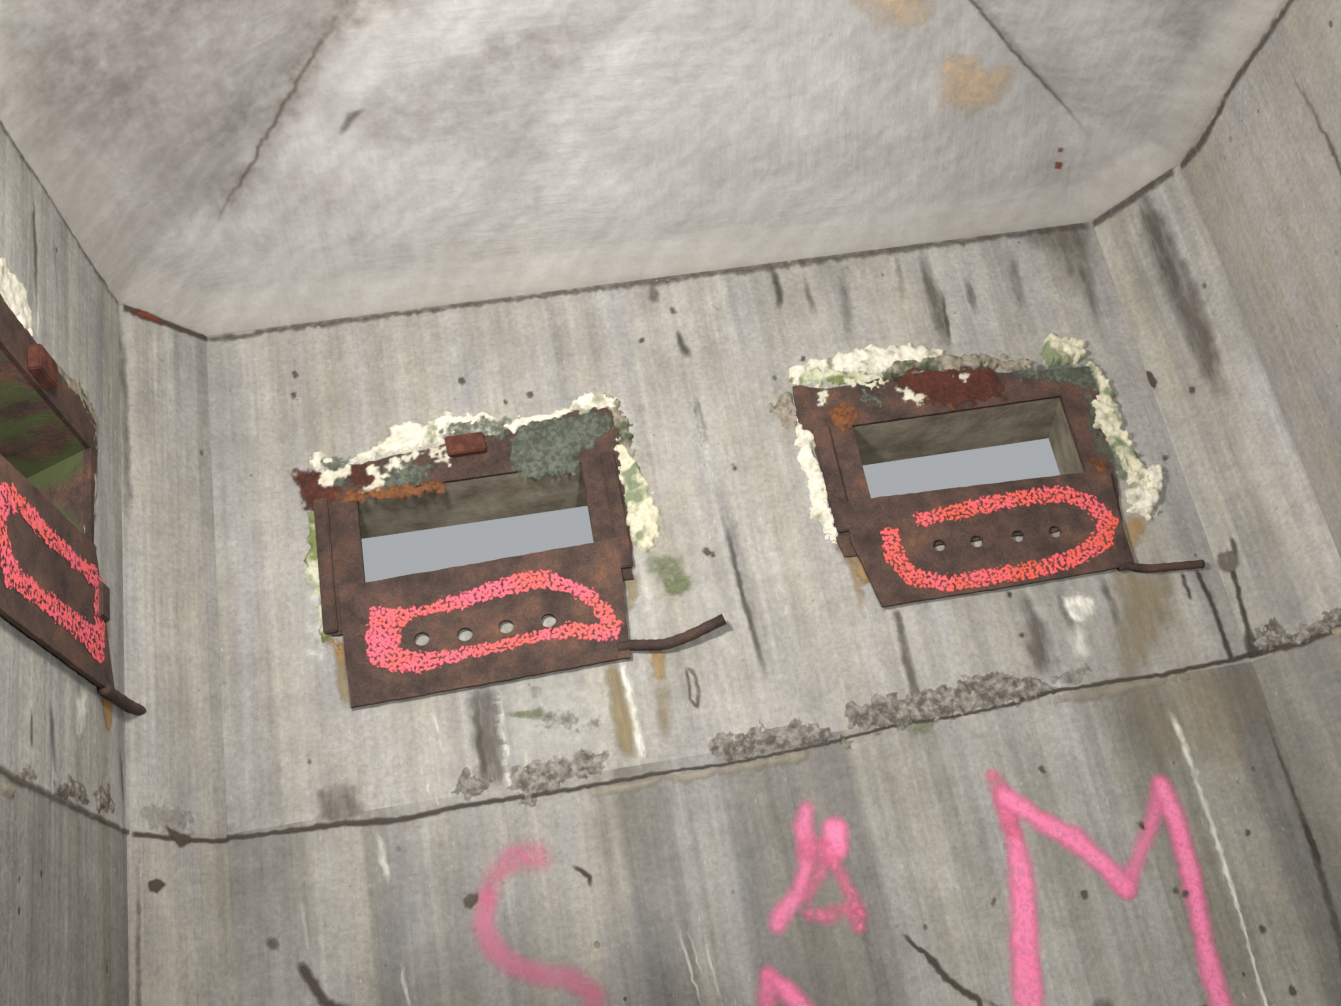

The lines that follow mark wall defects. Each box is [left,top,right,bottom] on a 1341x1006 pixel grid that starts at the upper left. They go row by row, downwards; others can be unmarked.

crack [63,0,1293,340]
rust [624,577,638,608]
rust [836,541,869,584]
spalling [1250,608,1341,651]
rust [328,636,349,700]
rust [609,668,632,752]
crack [0,625,1341,843]
spalling [709,671,1056,762]
spalling [457,768,493,796]
spalling [508,749,609,807]
crack [268,939,345,1006]
crack [906,936,982,1006]